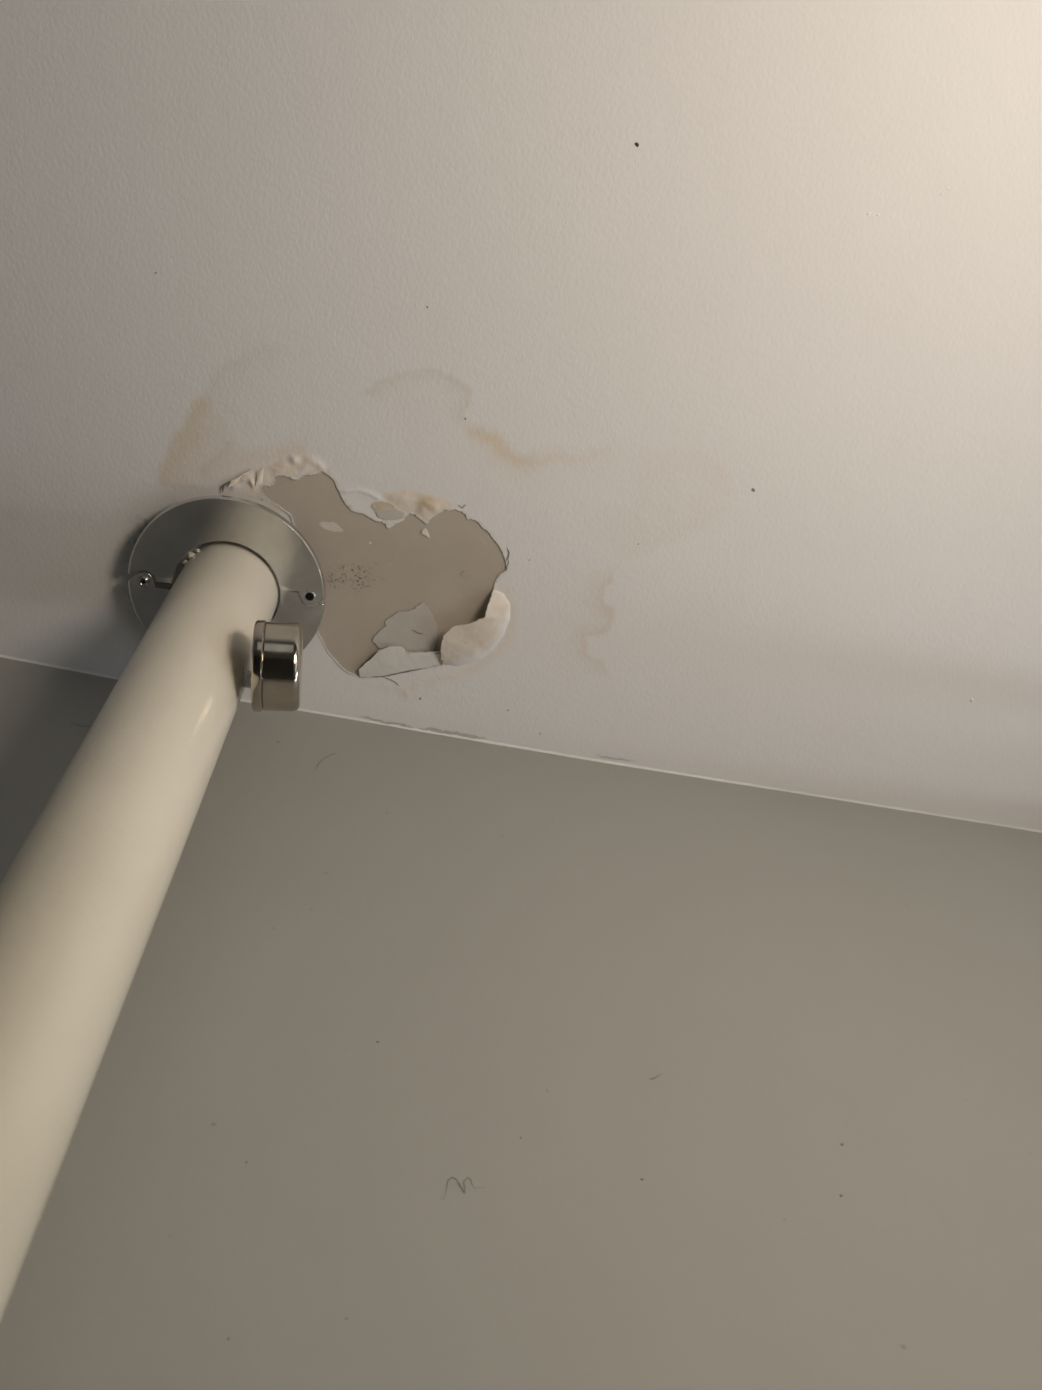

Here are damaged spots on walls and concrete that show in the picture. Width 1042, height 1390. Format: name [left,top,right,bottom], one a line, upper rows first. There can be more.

damp [152,389,316,504]
peeling [260,471,510,686]